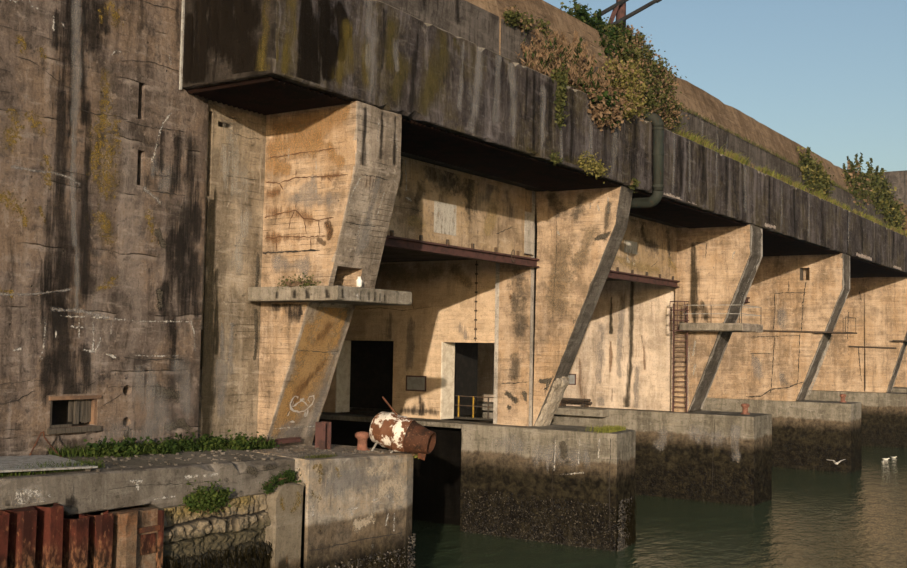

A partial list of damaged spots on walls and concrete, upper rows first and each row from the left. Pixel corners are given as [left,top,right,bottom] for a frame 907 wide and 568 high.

water stain [297,0,352,84]
water stain [409,22,419,113]
water stain [32,0,116,401]
crack [228,148,388,254]
water stain [118,115,219,438]